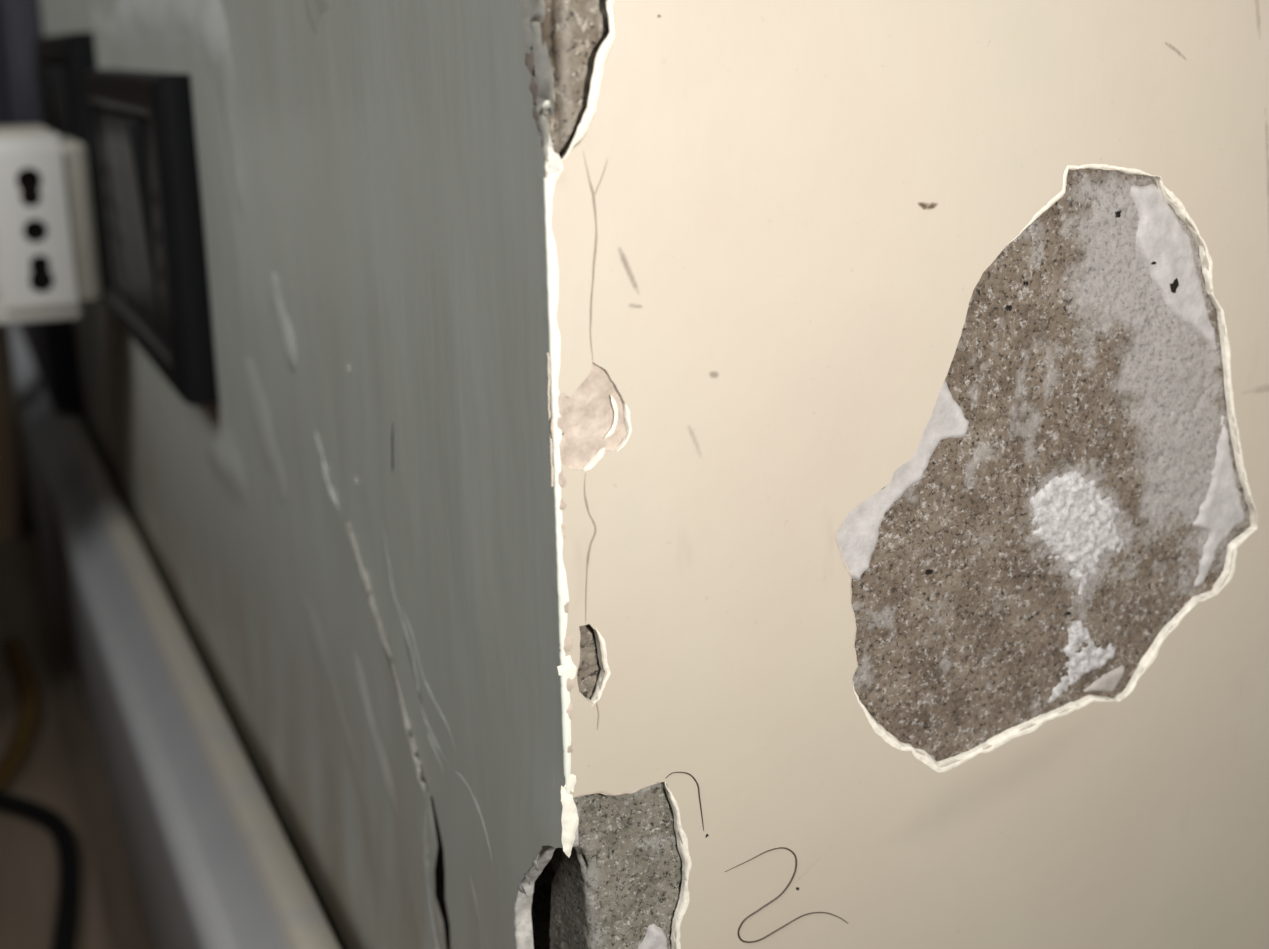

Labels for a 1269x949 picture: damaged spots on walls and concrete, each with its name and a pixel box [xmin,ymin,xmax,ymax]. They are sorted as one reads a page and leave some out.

crack [315,430,493,949]
spalling [512,0,692,949]
flaking render [835,164,1258,773]